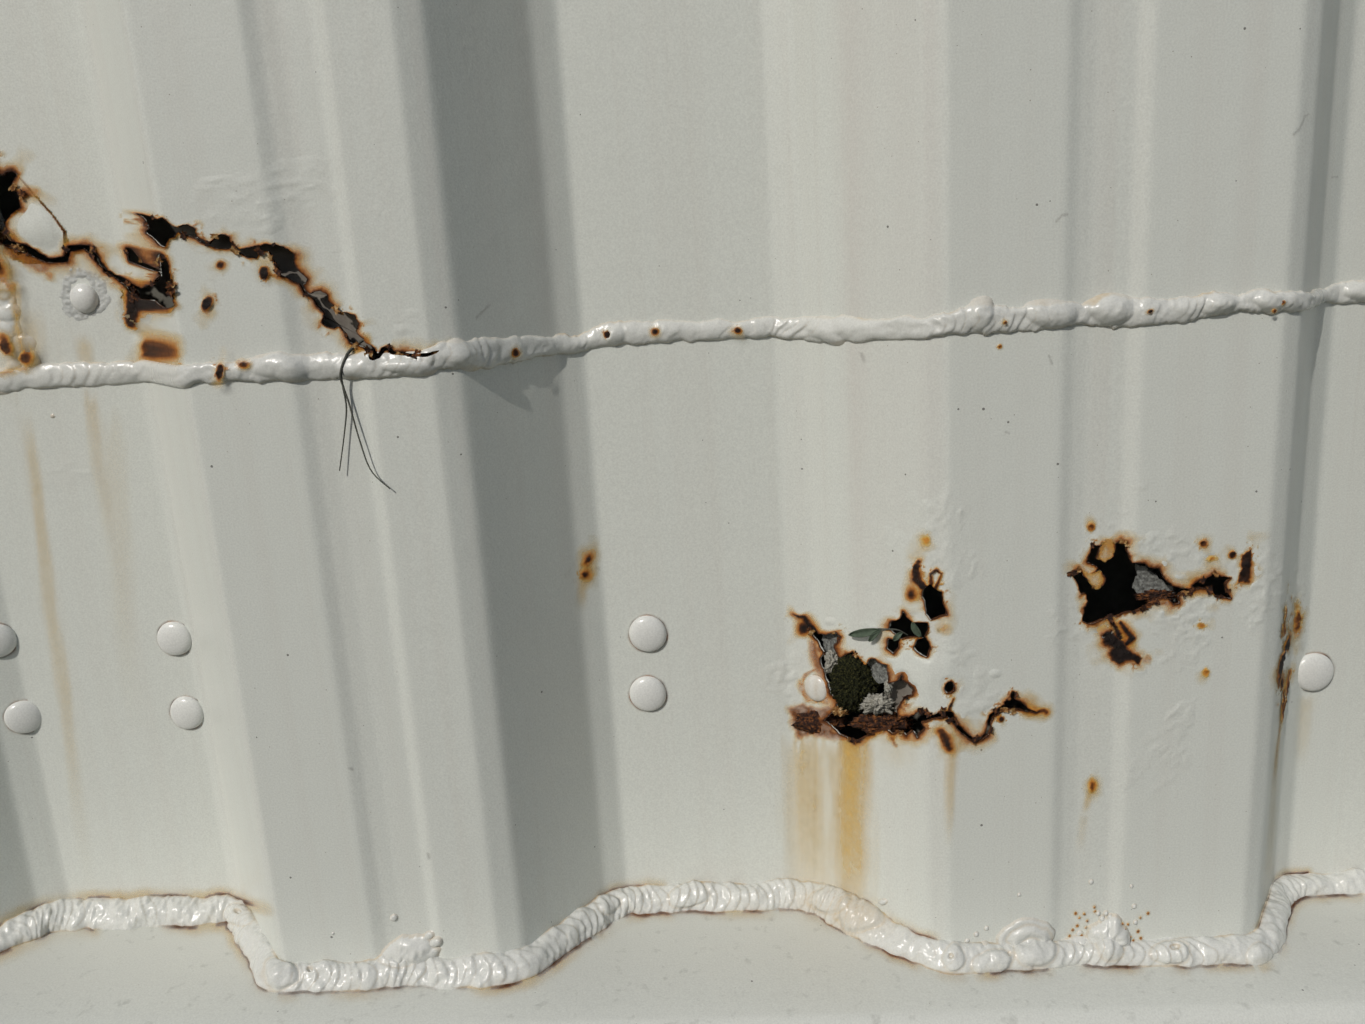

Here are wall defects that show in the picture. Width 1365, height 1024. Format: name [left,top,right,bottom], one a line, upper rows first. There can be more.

corrosion [205,234,281,282]
corrosion [0,315,34,373]
corrosion [122,280,181,364]
corrosion [201,295,217,314]
corrosion [213,360,250,382]
corrosion [344,333,439,361]
corrosion [577,549,596,581]
corrosion [1181,538,1255,599]
corrosion [1084,599,1160,669]
corrosion [1276,597,1304,722]
corrosion [840,730,904,869]
corrosion [1087,777,1098,794]